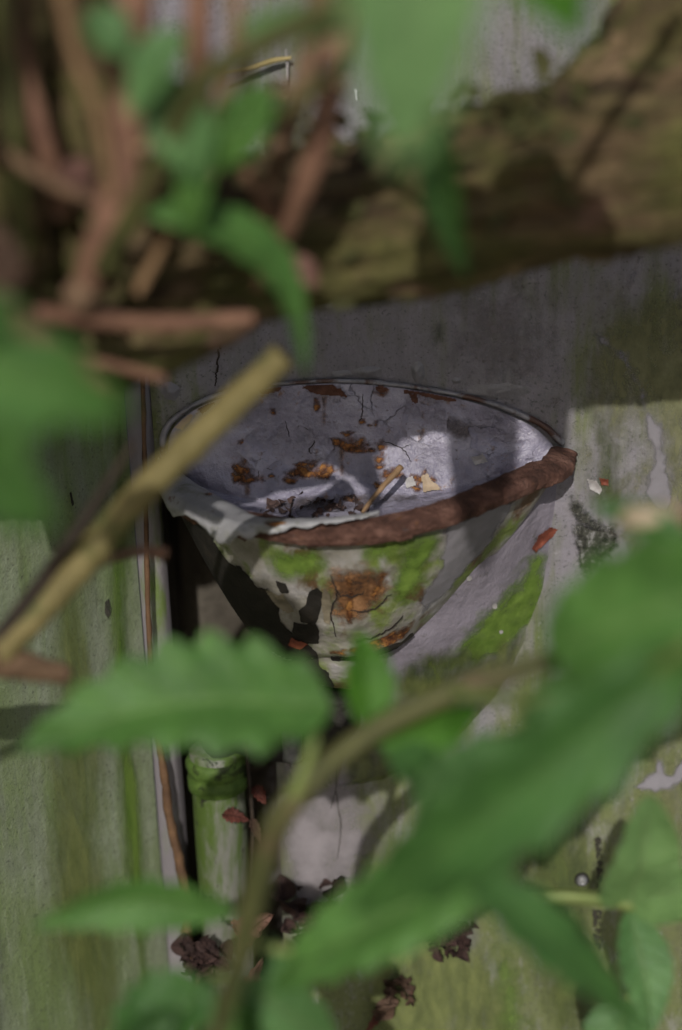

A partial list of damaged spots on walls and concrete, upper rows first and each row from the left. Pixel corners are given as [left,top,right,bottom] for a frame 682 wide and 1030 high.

corrosion [231,419,436,494]